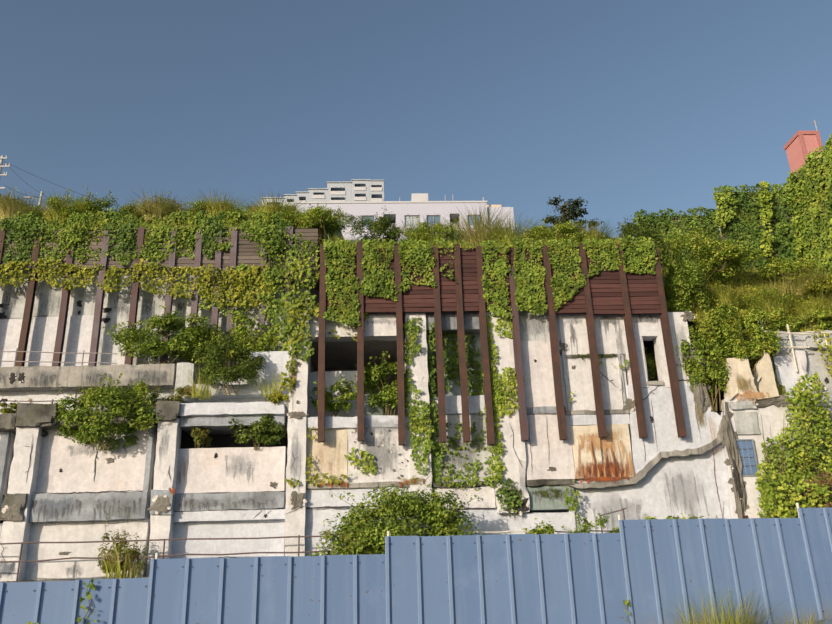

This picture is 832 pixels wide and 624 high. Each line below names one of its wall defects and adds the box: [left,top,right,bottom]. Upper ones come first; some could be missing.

crack [510,427,549,466]
rust [576,431,634,484]
spalling [2,504,19,520]
leakage [30,499,80,522]
leakage [93,498,140,522]
spalling [147,495,171,515]
spalling [286,491,307,510]